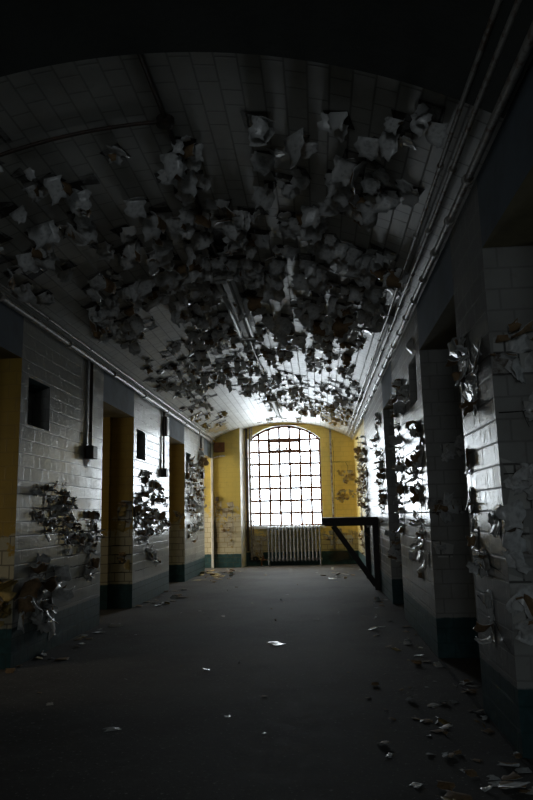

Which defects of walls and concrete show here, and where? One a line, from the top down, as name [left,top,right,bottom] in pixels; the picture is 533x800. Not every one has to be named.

peeling [0,99,448,430]
peeling [445,318,533,416]
peeling [0,481,106,641]
peeling [116,440,234,567]
peeling [324,378,490,582]
peeling [488,457,533,646]